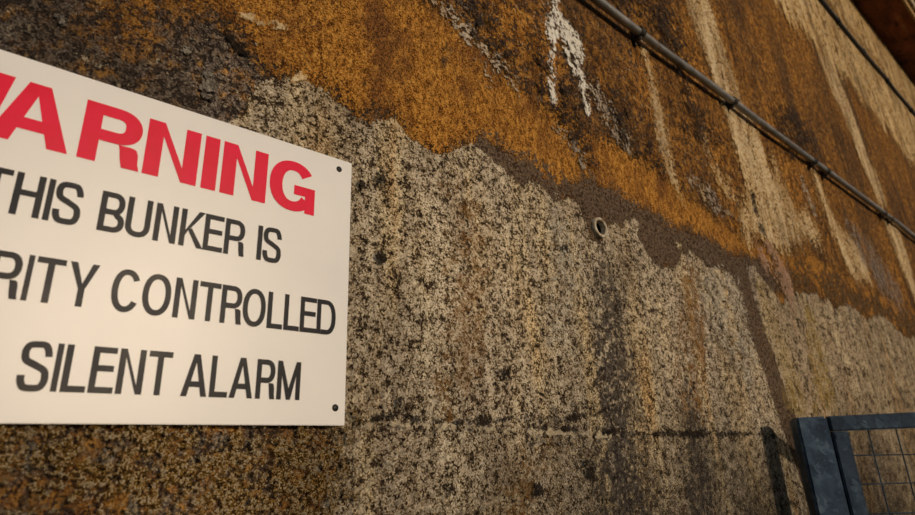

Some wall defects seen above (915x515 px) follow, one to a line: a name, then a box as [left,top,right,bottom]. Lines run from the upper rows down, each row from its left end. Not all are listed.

damp [448,0,915,515]